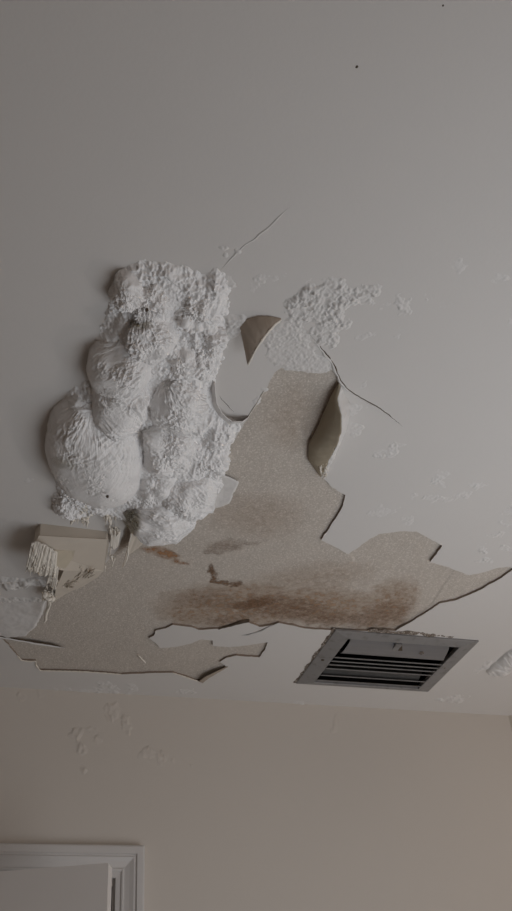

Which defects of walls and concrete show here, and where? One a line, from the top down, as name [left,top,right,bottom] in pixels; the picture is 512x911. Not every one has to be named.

crack [309,334,400,425]
peeling [0,368,511,680]
damp [173,565,407,622]